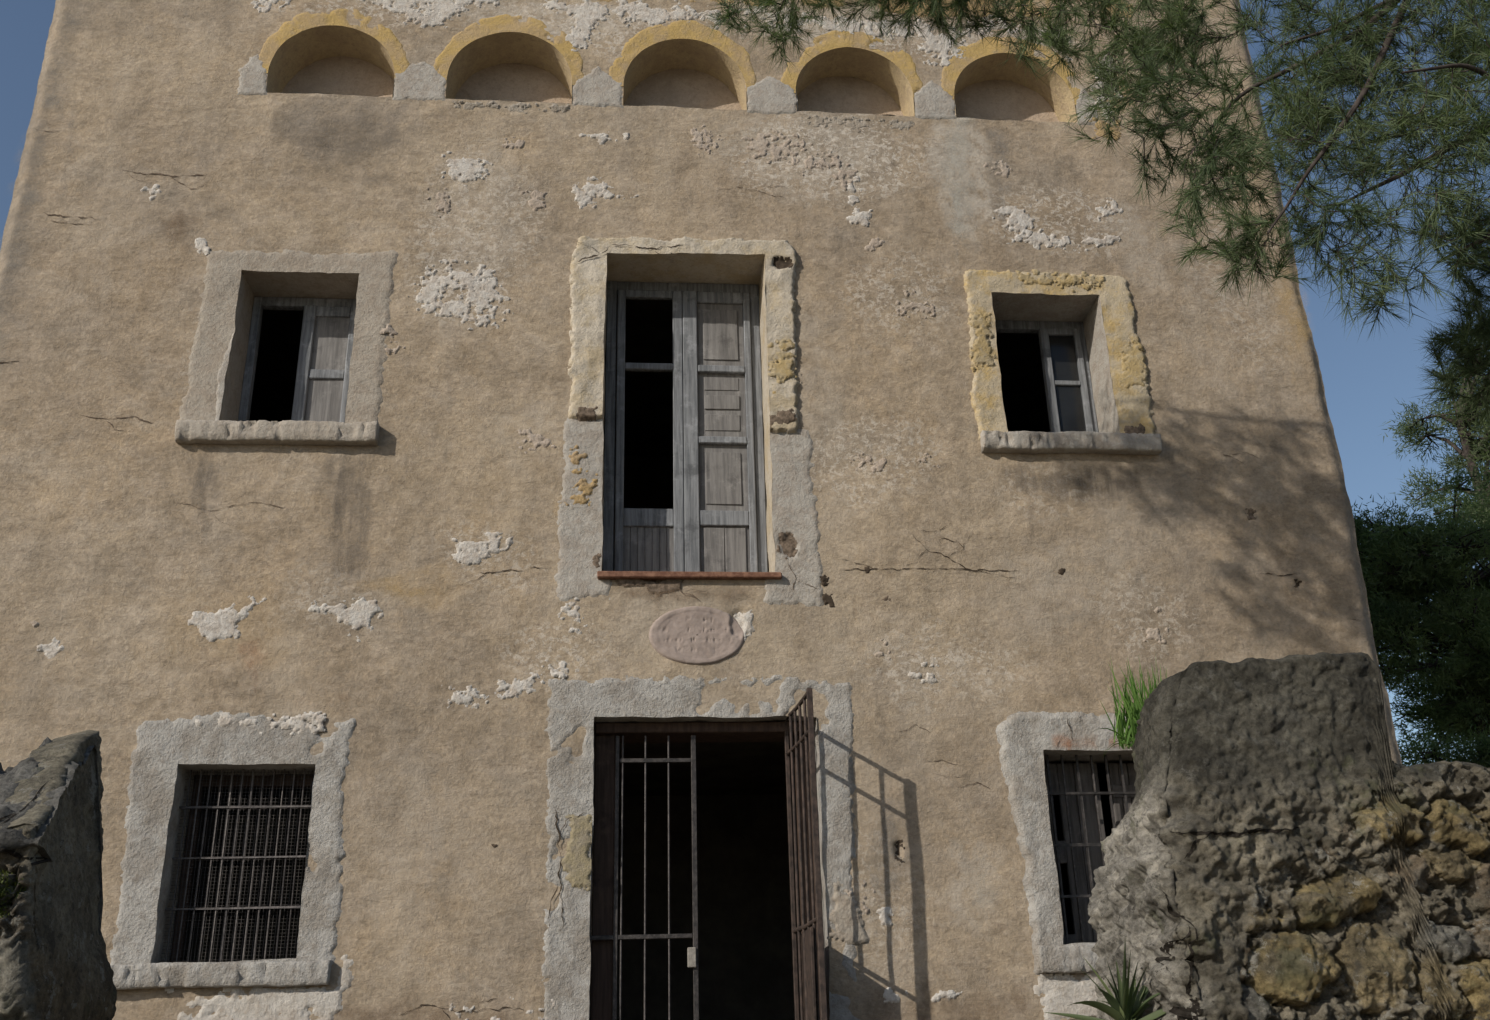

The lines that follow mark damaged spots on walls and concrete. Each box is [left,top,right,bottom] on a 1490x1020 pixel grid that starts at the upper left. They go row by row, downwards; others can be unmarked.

peeling [360,0,500,29]
peeling [540,0,721,52]
peeling [739,7,1073,67]
peeling [992,197,1123,253]
peeling [408,259,514,330]
crack [788,525,1020,597]
peeling [188,596,267,642]
peeling [308,595,384,642]
peeling [441,658,579,709]
peeling [195,711,326,736]
crack [548,809,586,927]
peeling [165,954,354,1020]